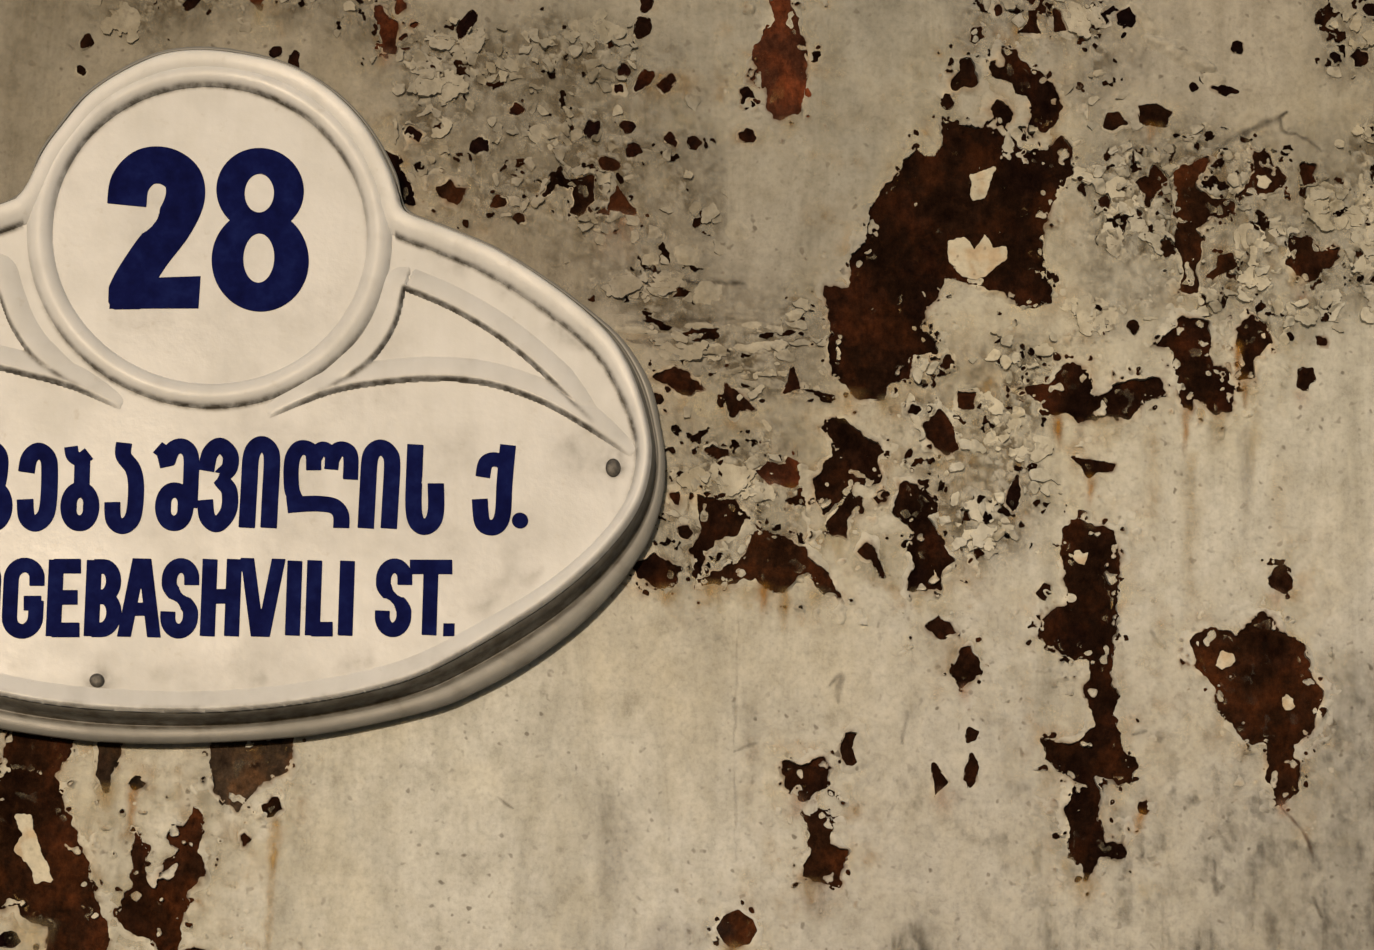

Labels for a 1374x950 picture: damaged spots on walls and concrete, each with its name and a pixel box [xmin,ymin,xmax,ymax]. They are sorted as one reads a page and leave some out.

peeling [269,46,300,68]
rust [724,0,833,145]
peeling [966,0,1137,130]
peeling [1189,72,1239,97]
peeling [1314,0,1374,80]
peeling [392,0,828,401]
peeling [1059,117,1374,349]
peeling [1296,367,1316,392]
peeling [652,406,806,577]
rust [627,24,1374,914]
rust [0,729,311,950]
rust [689,883,785,950]